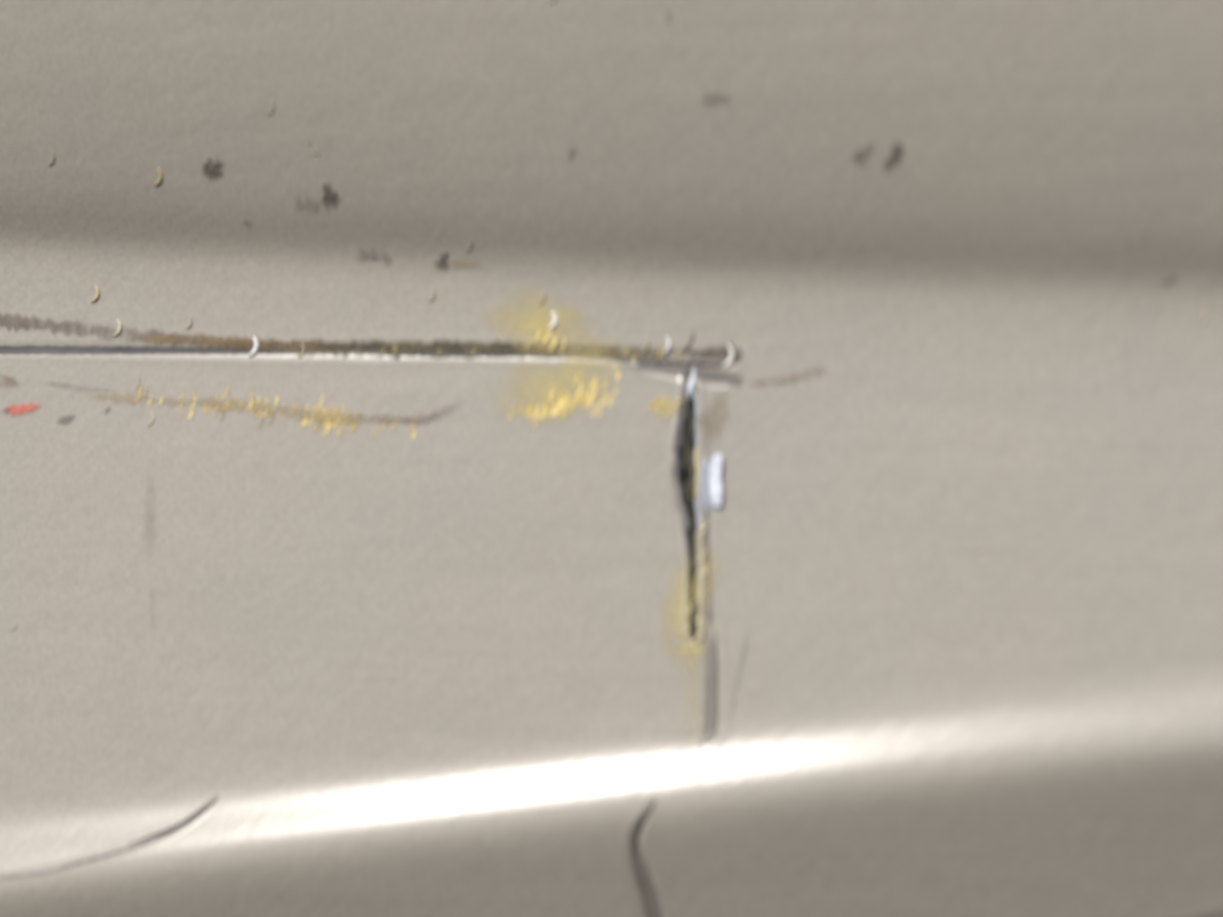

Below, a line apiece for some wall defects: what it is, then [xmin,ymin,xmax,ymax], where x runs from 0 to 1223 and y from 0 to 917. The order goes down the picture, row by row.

crack [61,799,217,869]